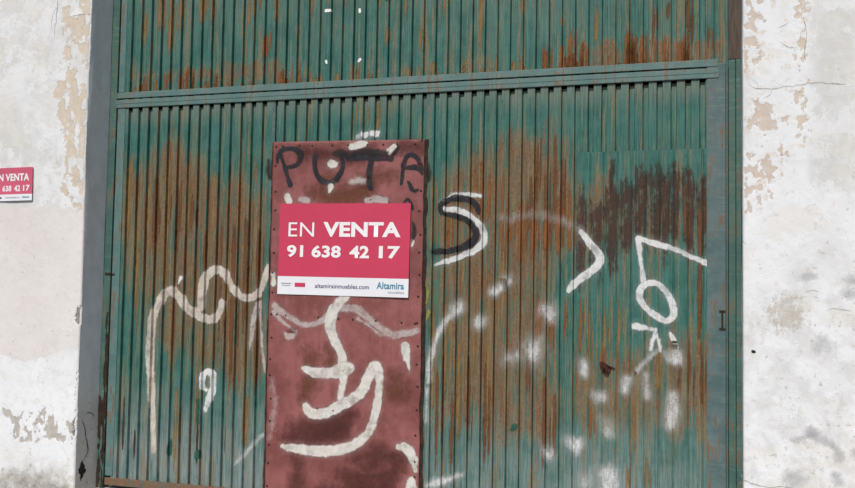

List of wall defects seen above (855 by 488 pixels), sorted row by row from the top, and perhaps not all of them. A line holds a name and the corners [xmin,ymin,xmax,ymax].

peeling [52,0,90,210]
rust [141,0,186,53]
rust [134,67,252,92]
rust [511,9,599,71]
rust [607,0,694,86]
peeling [744,0,766,72]
peeling [792,0,811,71]
peeling [744,79,811,214]
rust [124,135,264,448]
rust [429,137,707,472]
peeling [1,372,77,443]
rust [172,390,182,471]